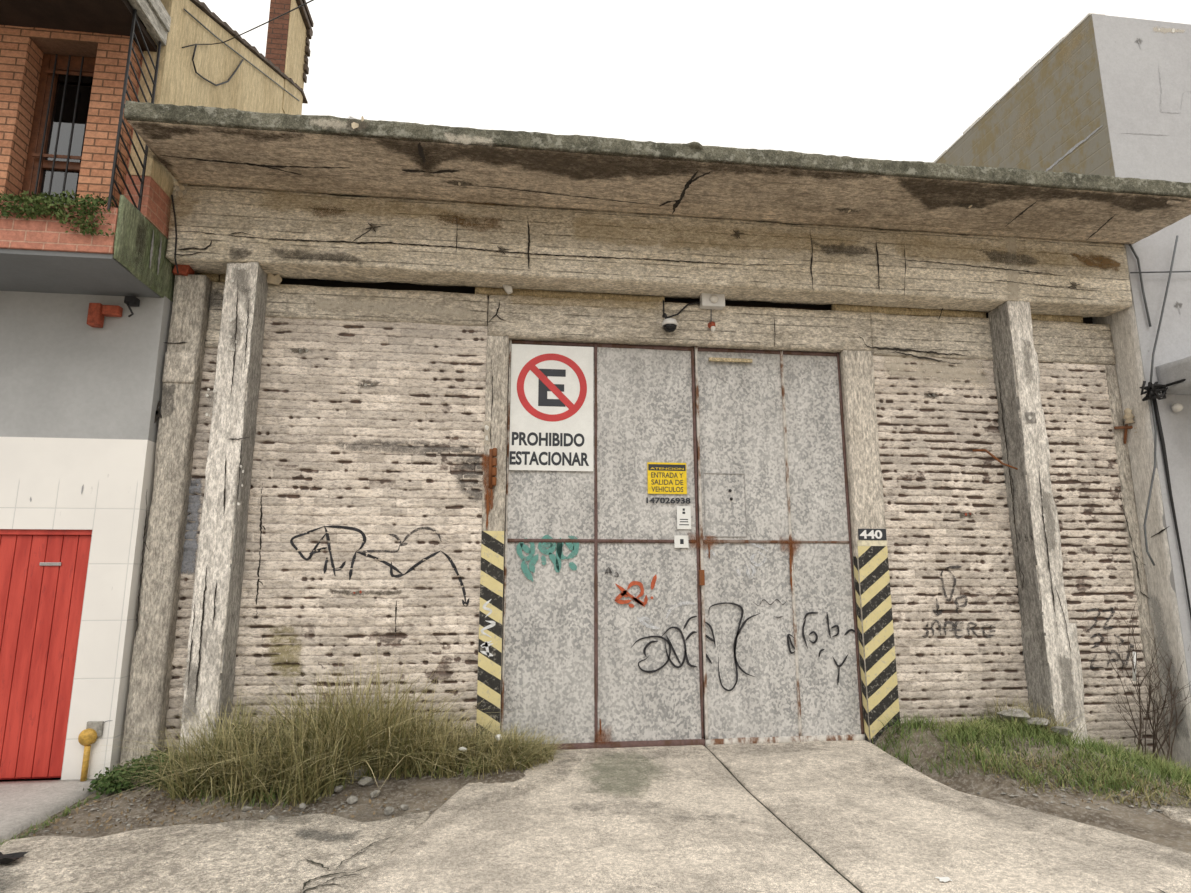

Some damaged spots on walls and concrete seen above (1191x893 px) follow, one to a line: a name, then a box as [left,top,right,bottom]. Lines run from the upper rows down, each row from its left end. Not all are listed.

leakage [133,119,882,180]
leakage [439,215,501,231]
crack [469,171,712,214]
leakage [899,178,1186,212]
crack [172,217,813,288]
rust [482,455,494,528]
rust [780,538,799,590]
crack [187,567,217,707]
crack [302,836,395,893]